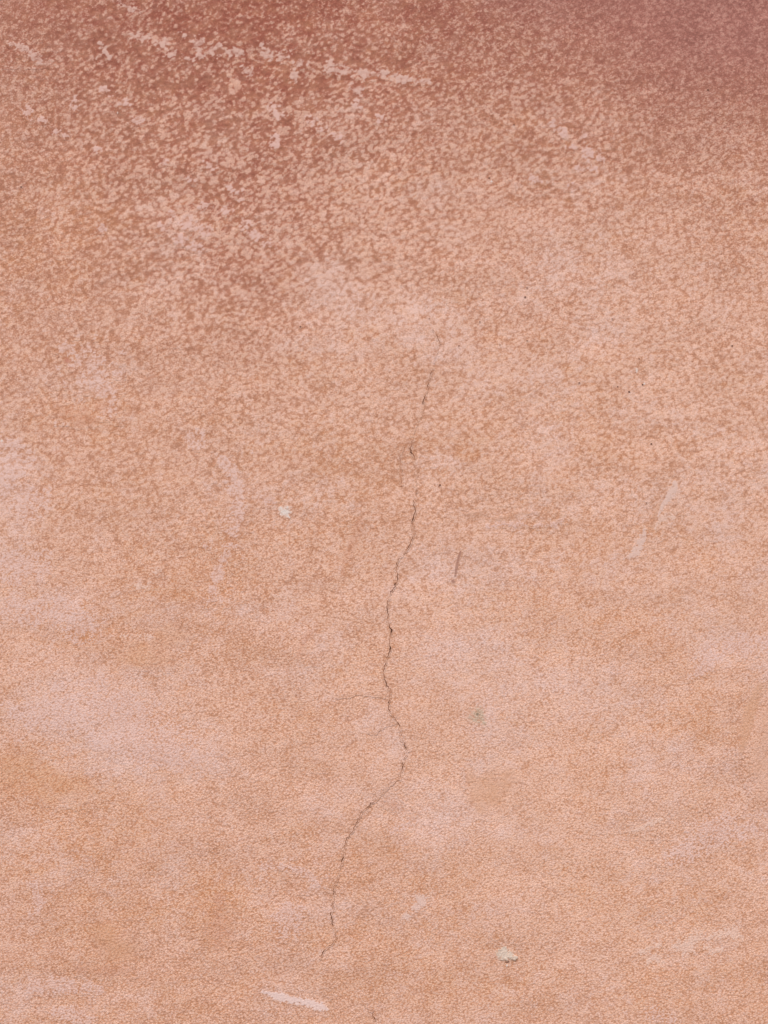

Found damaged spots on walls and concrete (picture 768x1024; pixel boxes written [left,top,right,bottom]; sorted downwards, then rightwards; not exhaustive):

crack [319,329,441,960]